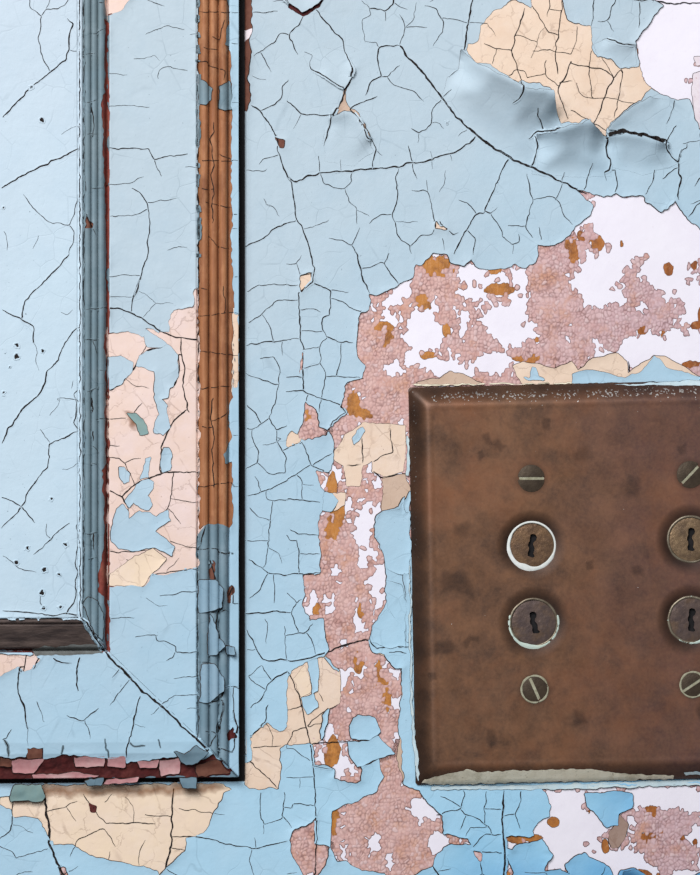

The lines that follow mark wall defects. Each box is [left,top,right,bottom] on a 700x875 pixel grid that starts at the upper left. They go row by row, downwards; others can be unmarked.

peeling [337,90,370,136]
crack [484,0,700,200]
crack [688,199,700,217]
peeling [0,0,239,676]
crack [1,0,239,757]
crack [158,0,594,875]
peeling [244,190,700,875]
peeling [197,560,239,741]
crack [0,794,154,875]
peeling [0,745,234,874]